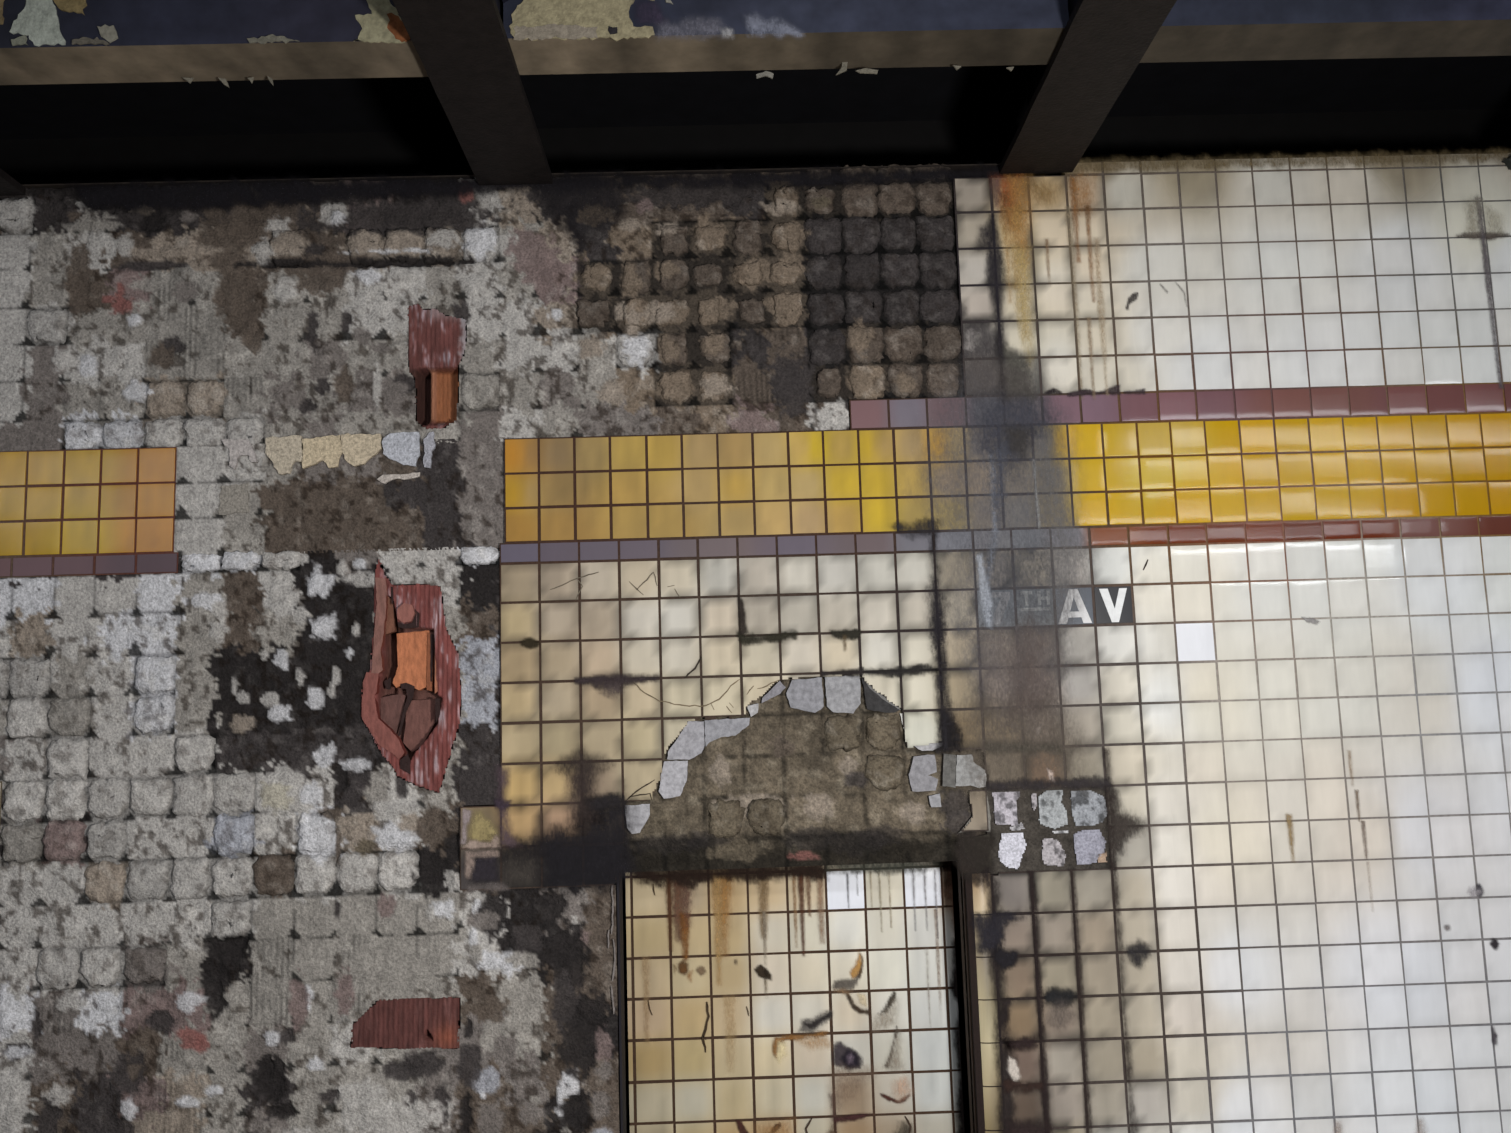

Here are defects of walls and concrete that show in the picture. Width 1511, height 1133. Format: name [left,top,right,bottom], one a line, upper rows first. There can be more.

peeling [0,0,118,47]
peeling [247,34,300,44]
peeling [354,0,410,44]
peeling [509,0,673,41]
rust [1067,178,1103,387]
leakage [978,468,996,627]
spalling [0,163,965,1133]
spalling [623,675,1111,874]
rust [666,879,691,960]
rust [760,879,768,946]
rust [793,875,824,955]
leakage [1045,988,1077,1025]